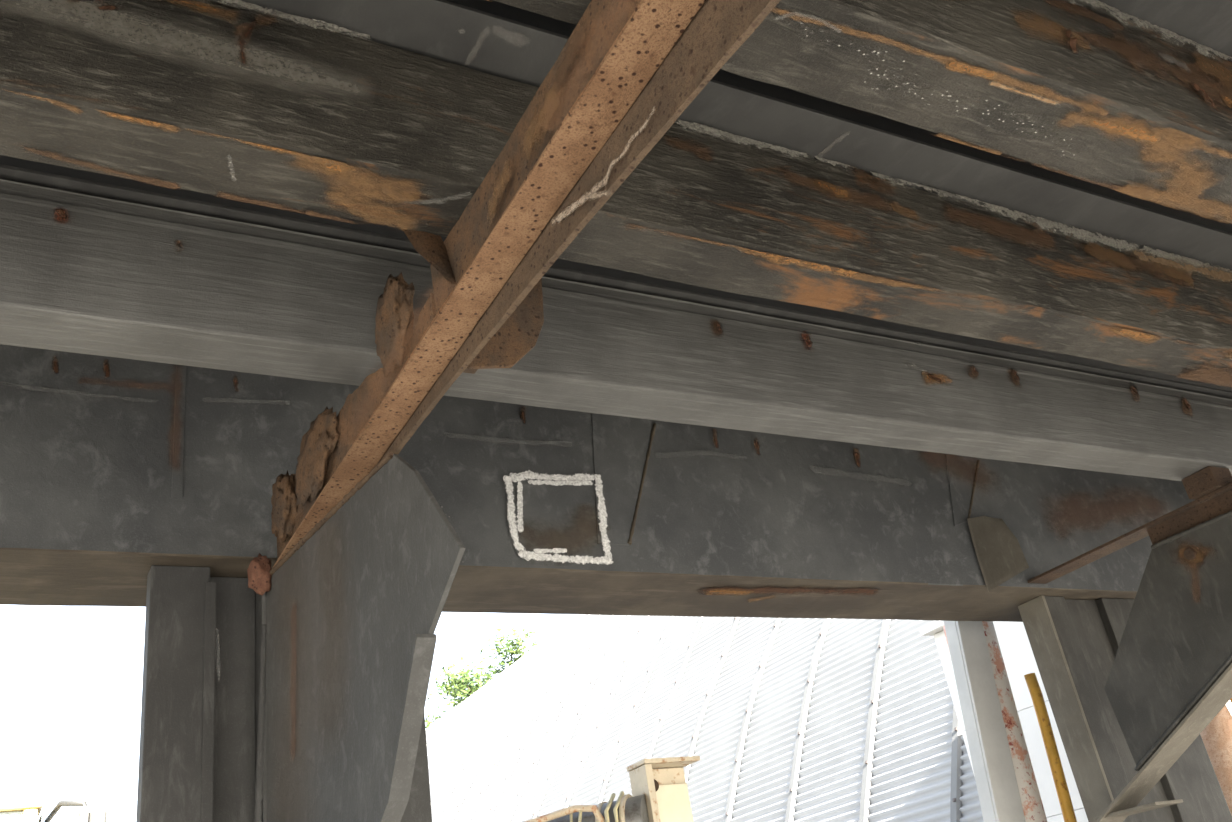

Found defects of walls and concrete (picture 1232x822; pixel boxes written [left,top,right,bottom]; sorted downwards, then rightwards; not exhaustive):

peeling [1068,0,1232,60]
peeling [677,119,1232,273]
corrosion [1085,320,1159,343]
corrosion [1177,340,1232,387]
corrosion [698,587,878,602]